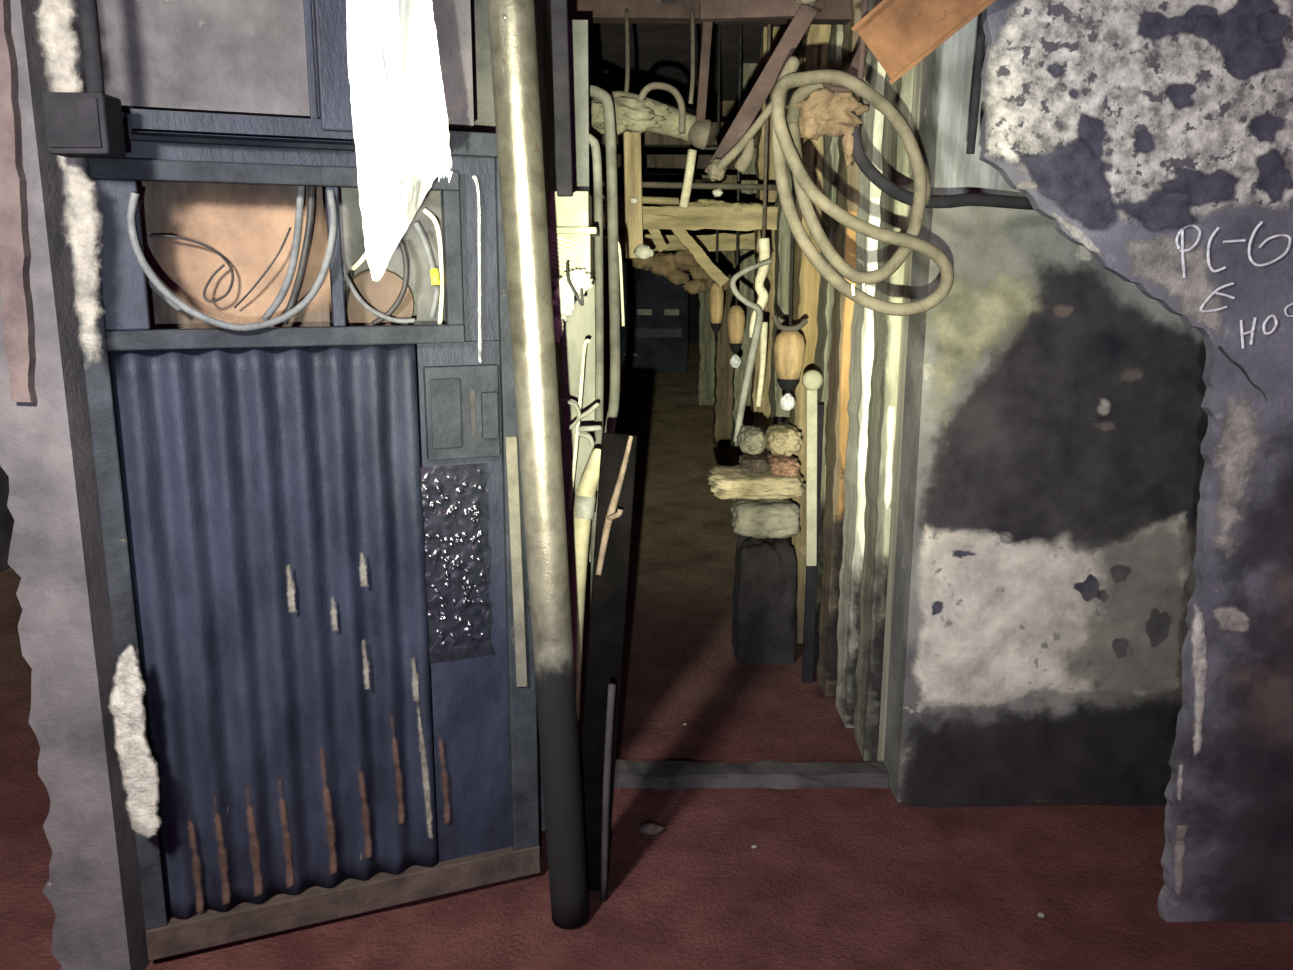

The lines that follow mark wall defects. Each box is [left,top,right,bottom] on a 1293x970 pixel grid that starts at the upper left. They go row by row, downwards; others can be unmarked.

peeling [987,0,1293,332]
damp [934,277,1036,391]
crack [1218,346,1267,401]
spalling [110,647,160,837]
flaking render [913,514,1249,800]
spalling [1174,825,1188,894]